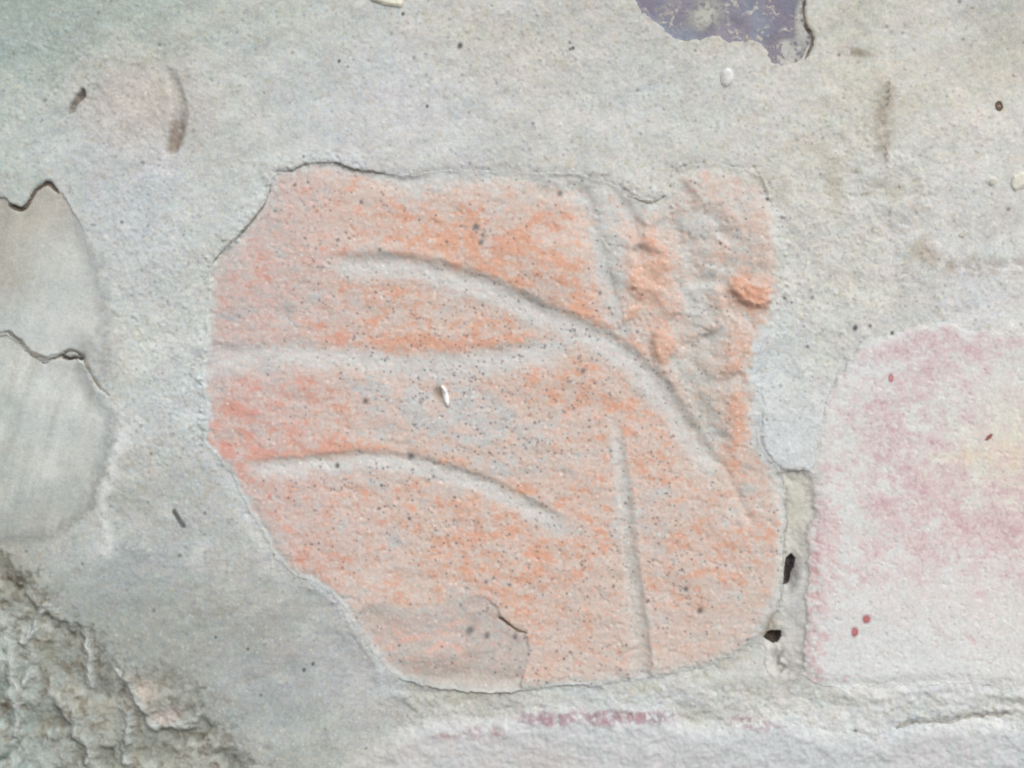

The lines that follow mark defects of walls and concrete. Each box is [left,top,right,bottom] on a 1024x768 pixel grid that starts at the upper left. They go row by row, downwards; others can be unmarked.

peeling [636,0,810,66]
peeling [0,183,109,375]
spalling [0,550,255,768]